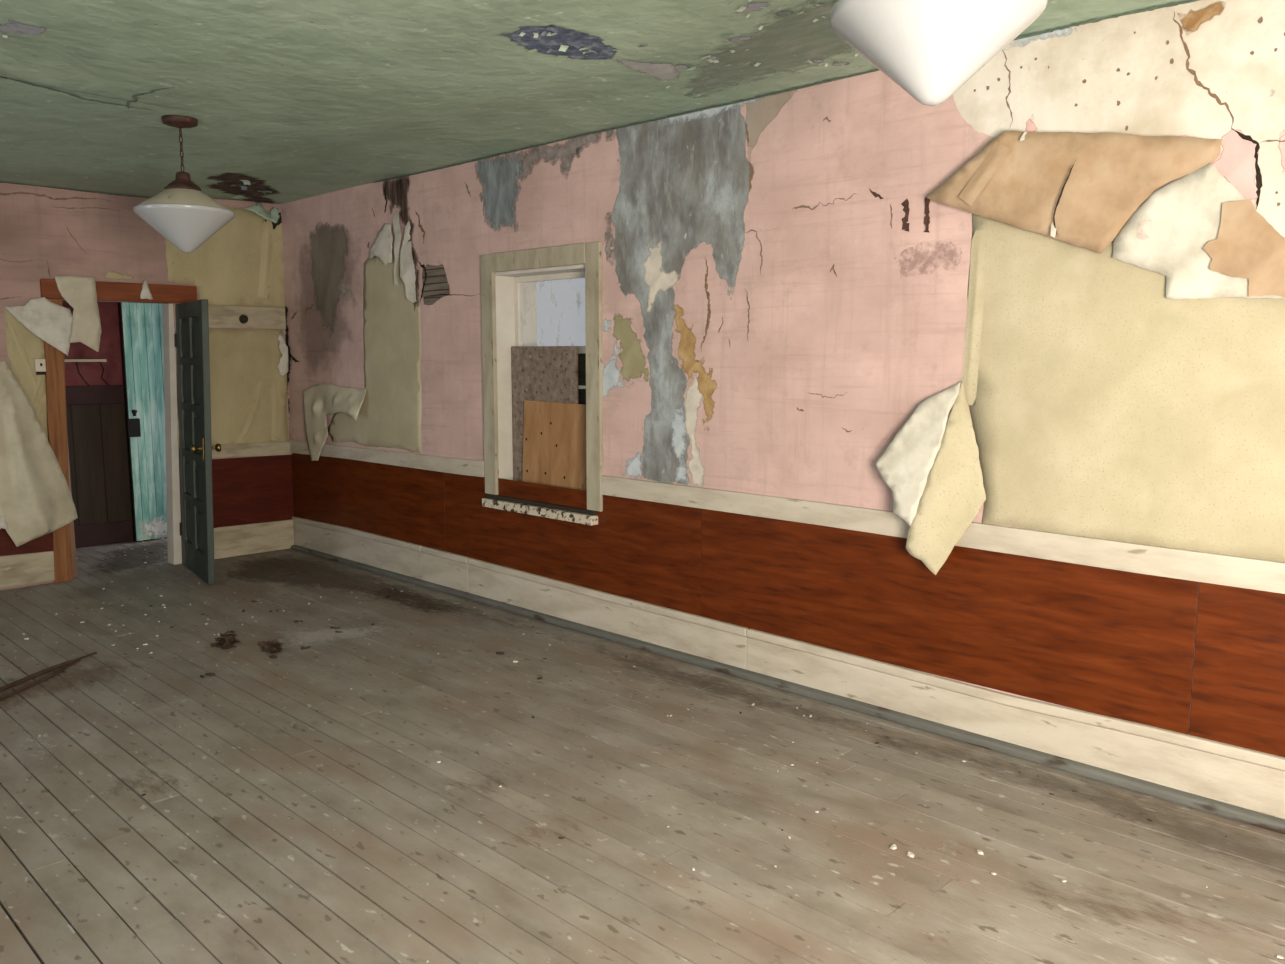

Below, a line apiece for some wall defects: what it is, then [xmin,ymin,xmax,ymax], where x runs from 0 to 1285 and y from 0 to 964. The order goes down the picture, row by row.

crack [0,76,174,111]
crack [373,69,880,183]
flaking render [926,0,1285,299]
crack [1002,0,1285,209]
peeling [5,276,102,356]
leakage [291,225,350,332]
peeling [502,24,791,485]
peeling [0,361,78,547]
peeling [303,384,367,461]
peeling [875,381,986,575]